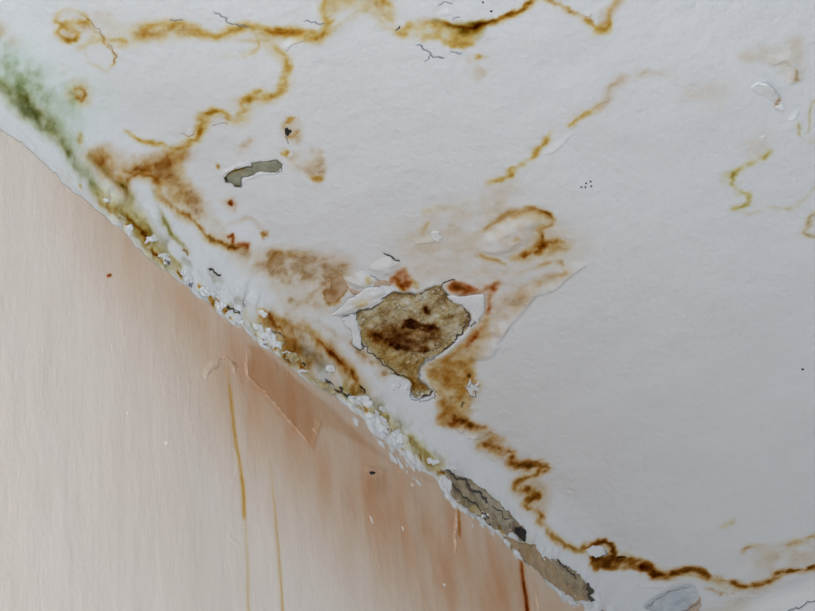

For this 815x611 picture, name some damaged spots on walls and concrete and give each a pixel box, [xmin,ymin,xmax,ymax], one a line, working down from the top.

damp [448,0,532,33]
damp [17,101,39,123]
spalling [218,159,286,188]
spalling [324,258,587,402]
damp [445,413,479,429]
peeling [450,418,506,469]
damp [483,443,548,510]
damp [551,534,711,579]
damp [730,565,815,588]
spalling [633,580,756,611]